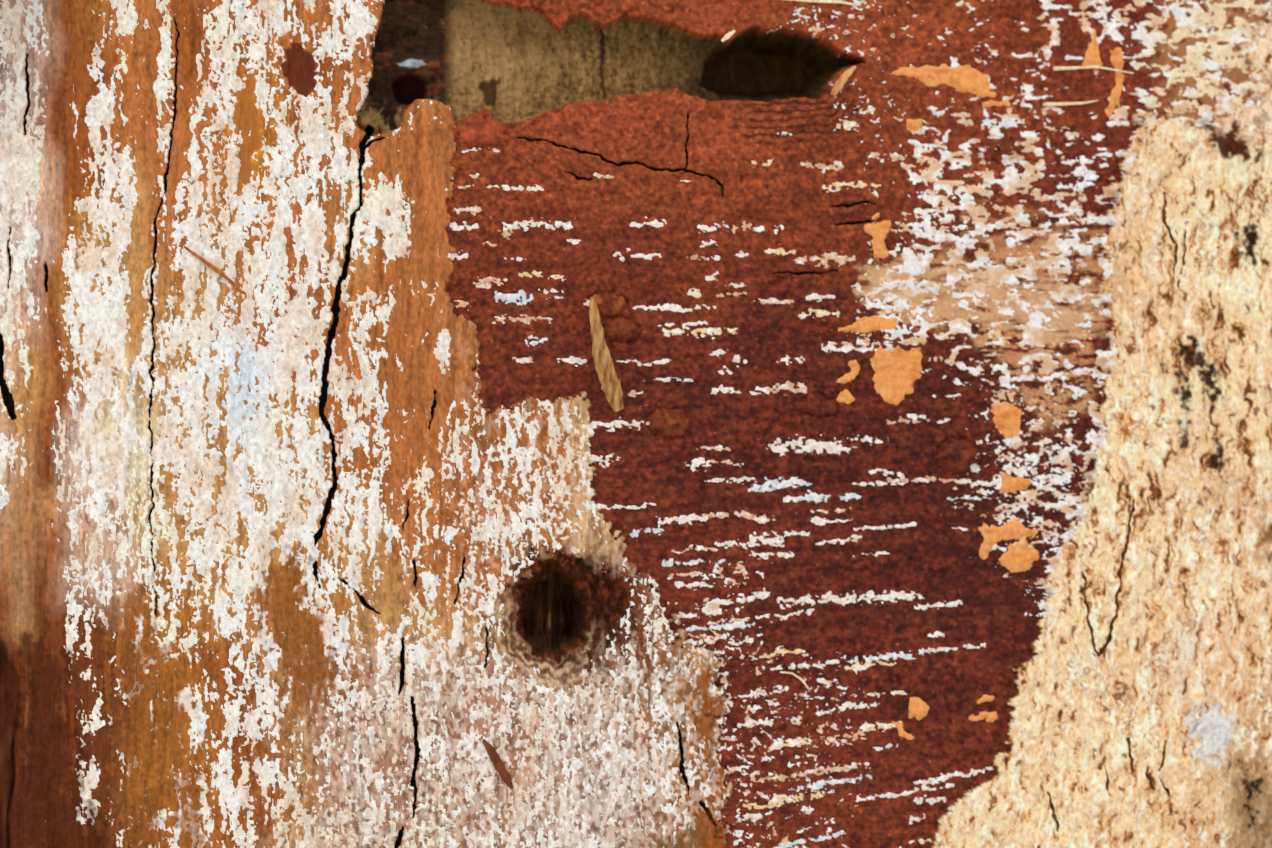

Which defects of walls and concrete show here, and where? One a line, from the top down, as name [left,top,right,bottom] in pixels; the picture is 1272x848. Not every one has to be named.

crack [22,54,30,135]
crack [517,113,724,197]
crack [5,227,13,289]
peeling [0,0,56,509]
crack [42,262,50,292]
peeling [831,0,1272,617]
crack [0,334,17,420]
crack [313,125,385,614]
peeling [51,0,895,848]
crack [394,637,420,848]
peeling [892,697,929,740]
peeling [969,695,998,722]